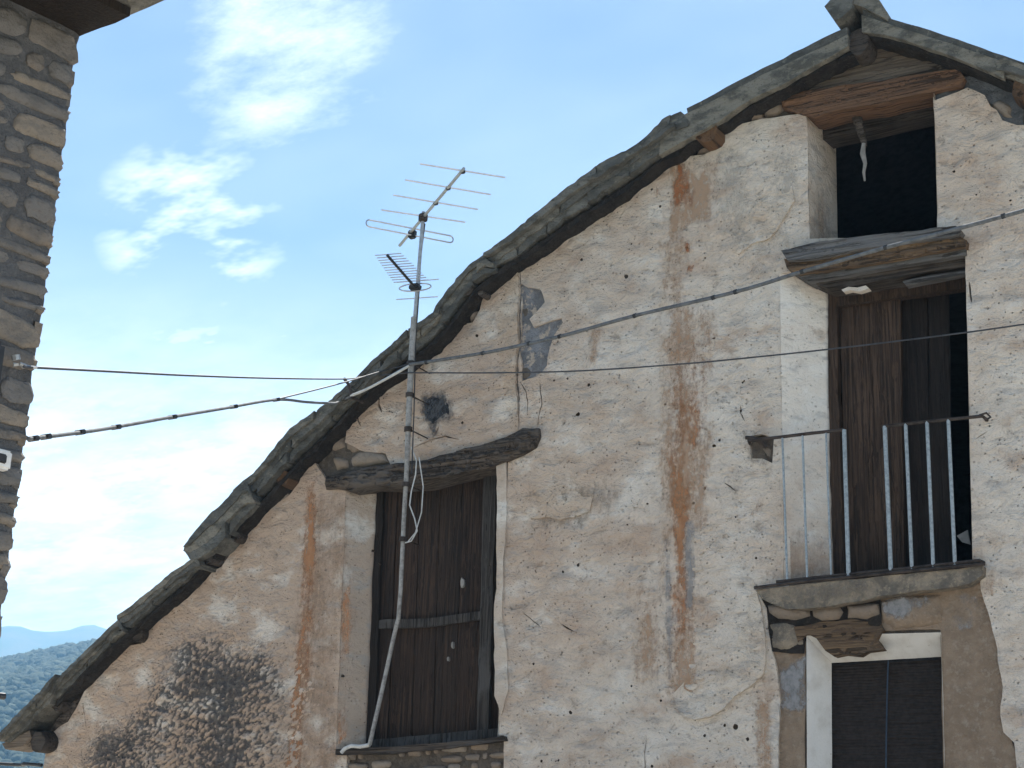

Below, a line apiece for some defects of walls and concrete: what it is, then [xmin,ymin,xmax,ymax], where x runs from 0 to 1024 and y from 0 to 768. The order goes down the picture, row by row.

rust [669,164,716,271]
flaking render [496,272,563,430]
rust [302,490,315,587]
rust [662,309,710,691]
mould [55,605,321,768]
rust [286,610,312,768]
spalling [660,580,1017,768]